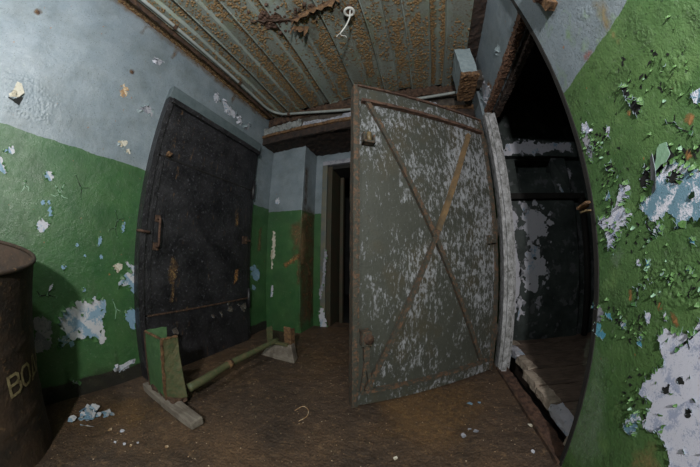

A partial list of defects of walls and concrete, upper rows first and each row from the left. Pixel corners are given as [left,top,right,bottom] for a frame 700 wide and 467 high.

peeling [8,82,25,106]
peeling [213,92,251,130]
corrosion [118,0,480,128]
corrosion [484,11,535,117]
peeling [608,48,700,119]
peeling [34,200,55,232]
peeling [33,285,108,355]
peeling [111,260,134,295]
corrosion [285,213,314,325]
peeling [512,199,554,322]
peeling [580,116,700,308]
peeling [591,297,700,467]